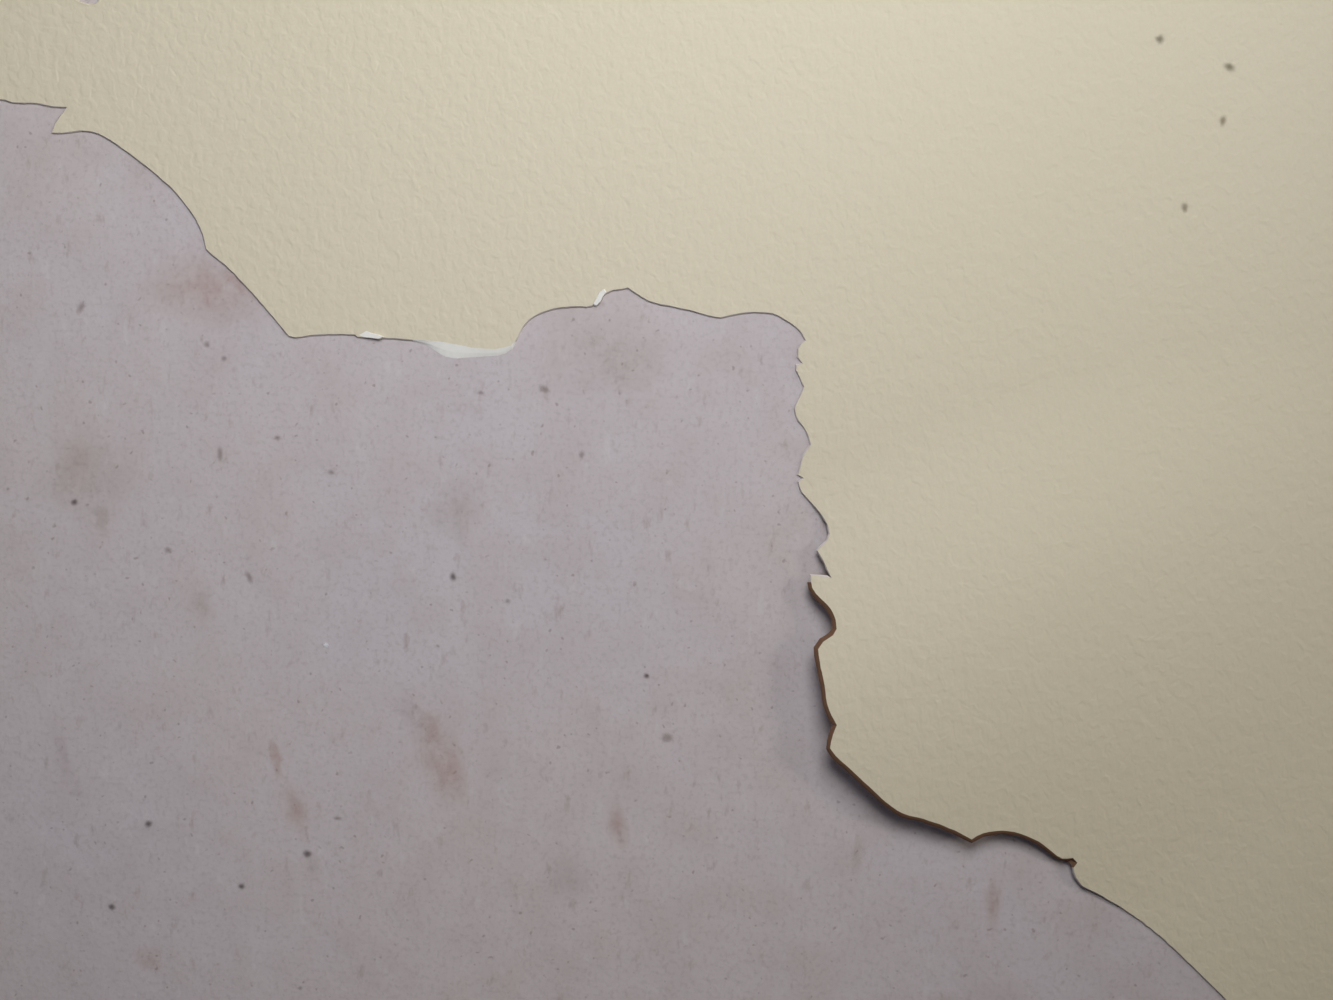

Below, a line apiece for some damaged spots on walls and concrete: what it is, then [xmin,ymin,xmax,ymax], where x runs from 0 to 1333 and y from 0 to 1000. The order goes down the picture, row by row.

peeling [0,99,67,108]
peeling [52,130,206,248]
peeling [206,249,363,339]
peeling [360,331,384,339]
peeling [413,340,516,359]
peeling [515,305,594,341]
peeling [603,287,1333,928]
peeling [1072,867,1226,1000]